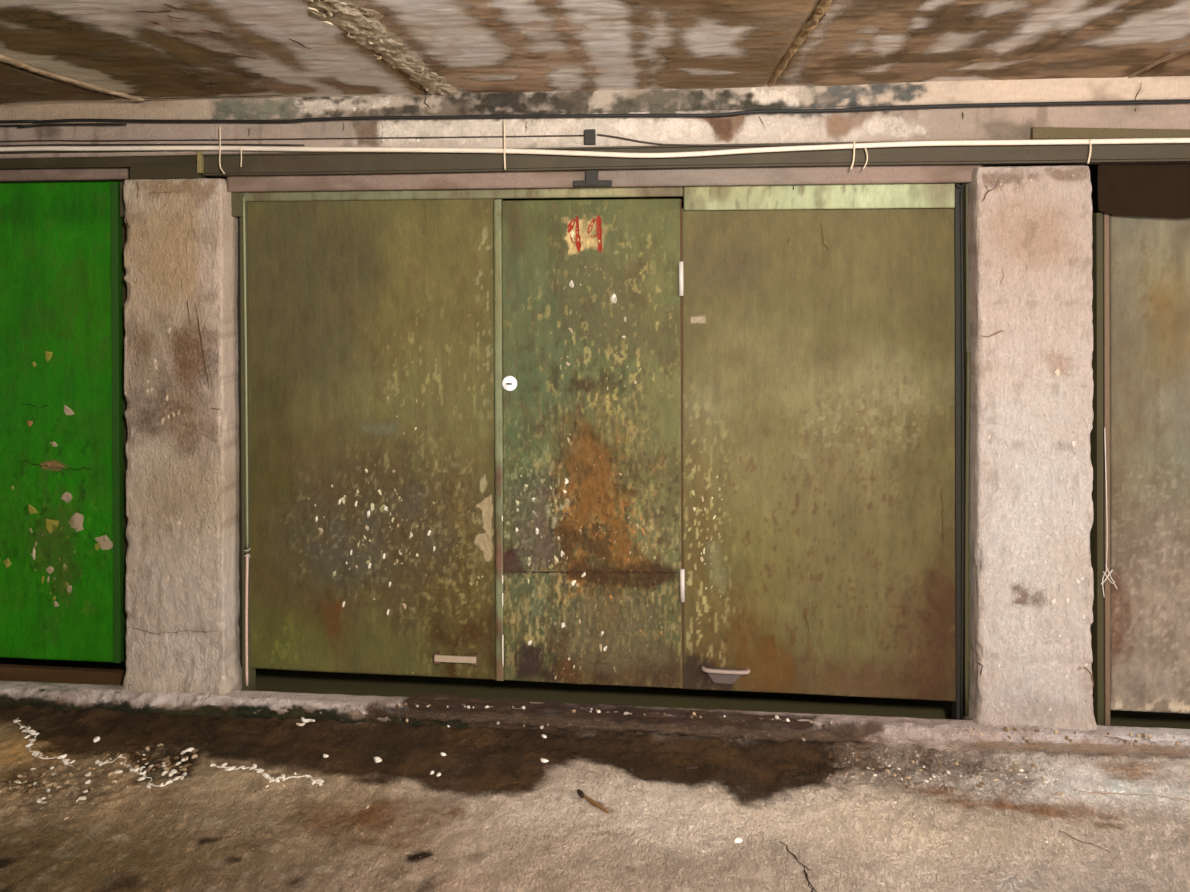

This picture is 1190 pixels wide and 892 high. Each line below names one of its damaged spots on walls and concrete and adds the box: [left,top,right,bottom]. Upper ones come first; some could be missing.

damp [0,0,1190,145]
peeling [564,266,646,346]
peeling [40,442,66,470]
peeling [28,492,84,607]
peeling [94,535,113,551]
peeling [307,473,494,615]
corrosion [550,426,673,618]
damp [0,693,981,806]
crack [780,841,817,892]